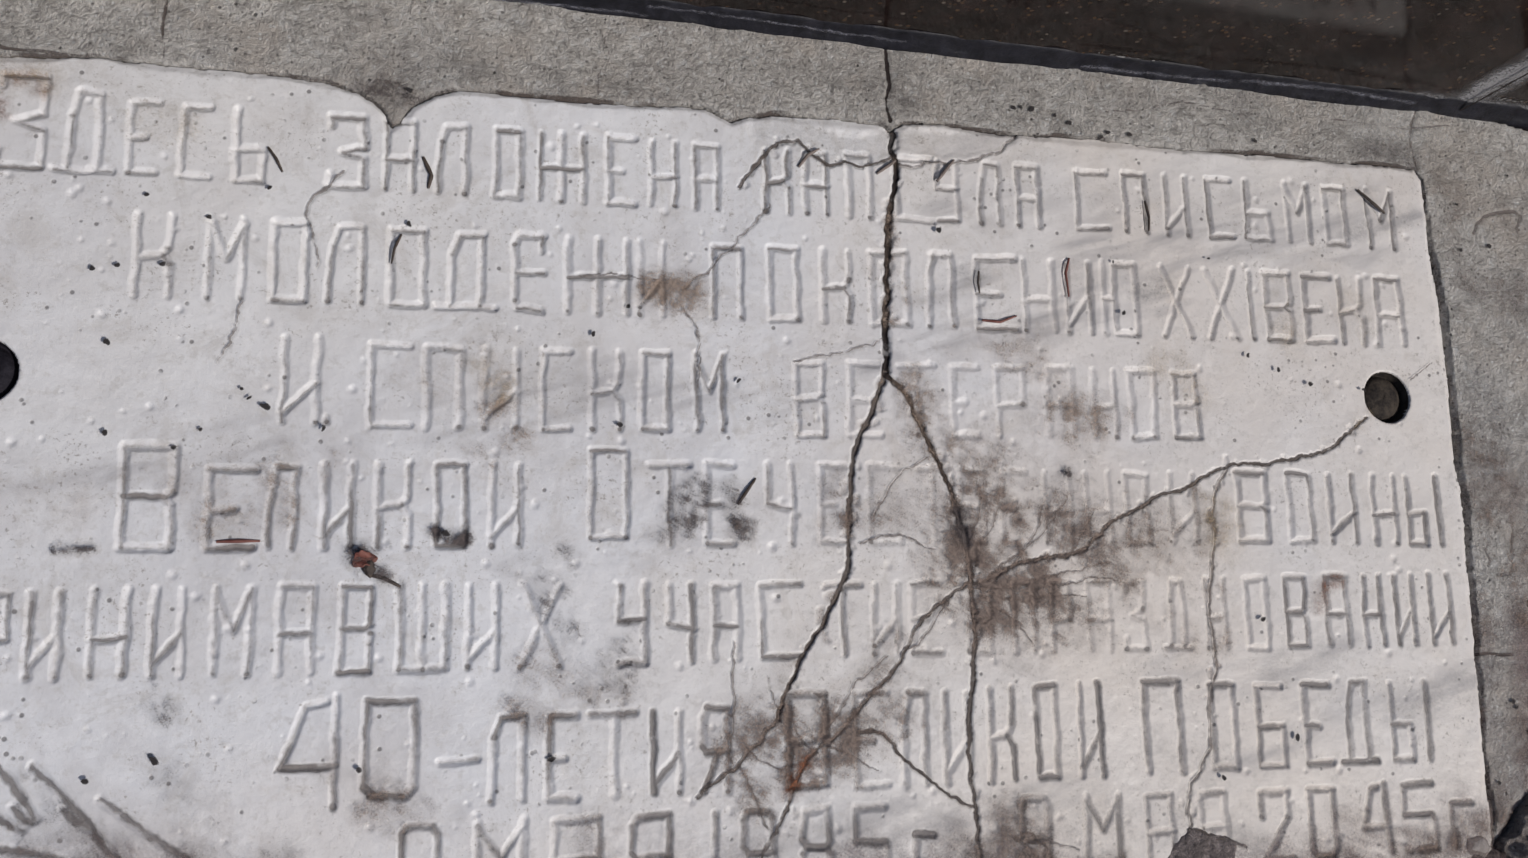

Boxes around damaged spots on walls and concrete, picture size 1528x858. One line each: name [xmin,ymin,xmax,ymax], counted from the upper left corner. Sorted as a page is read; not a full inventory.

crack [580,50,1368,858]